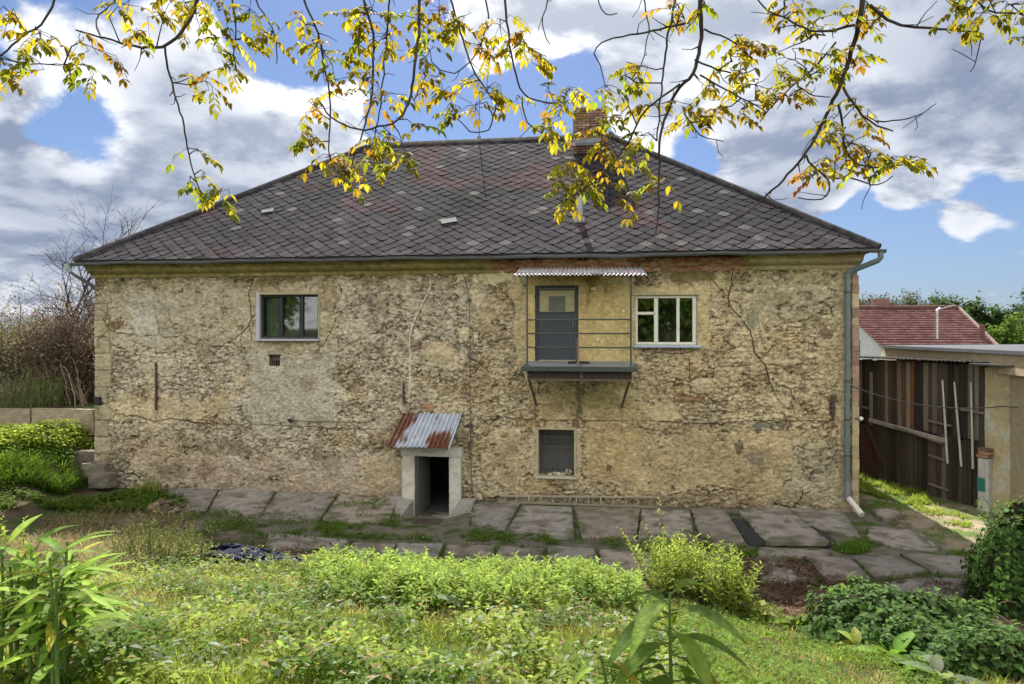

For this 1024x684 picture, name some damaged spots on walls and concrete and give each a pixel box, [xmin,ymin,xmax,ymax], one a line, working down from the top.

crack [103,403,219,424]
crack [472,269,829,424]